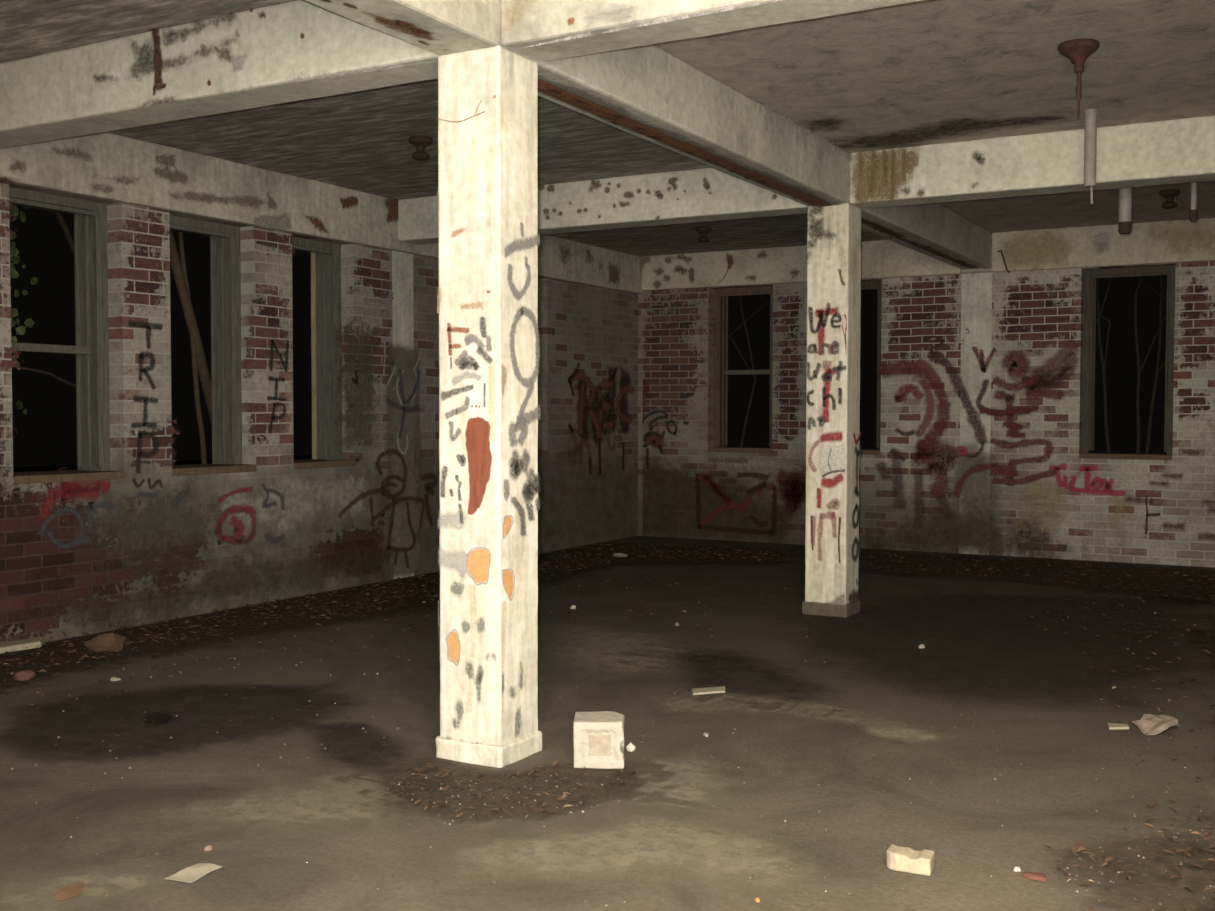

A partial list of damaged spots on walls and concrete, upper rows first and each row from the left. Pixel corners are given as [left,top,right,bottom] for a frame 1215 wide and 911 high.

rust [149,29,166,94]
peeling [0,191,17,311]
peeling [643,255,725,427]
peeling [861,218,978,375]
peeling [993,274,1084,360]